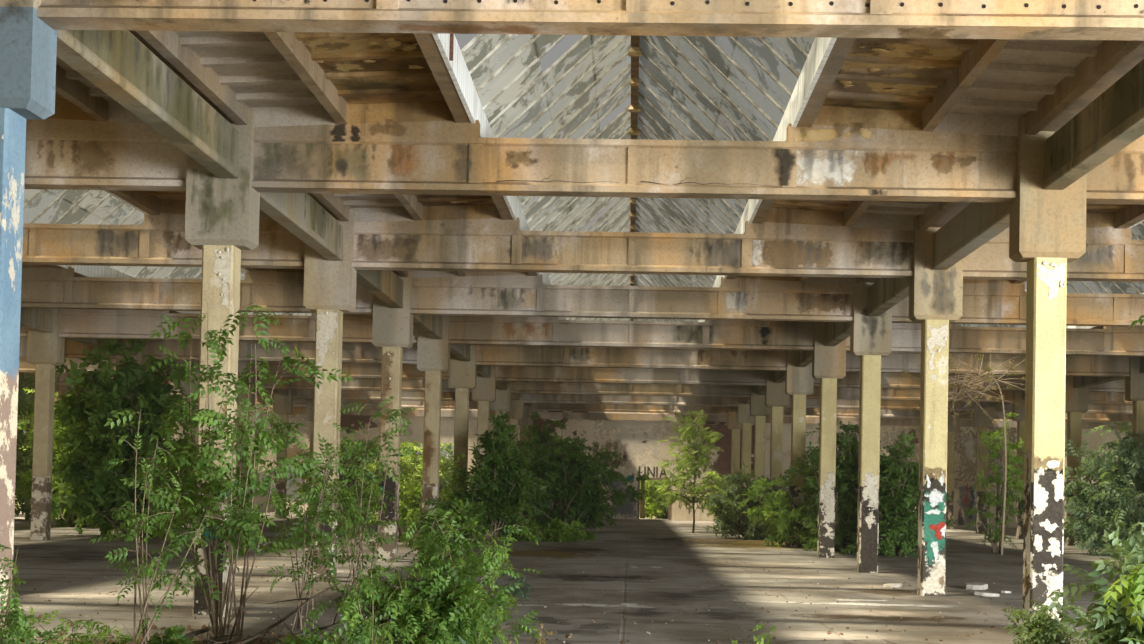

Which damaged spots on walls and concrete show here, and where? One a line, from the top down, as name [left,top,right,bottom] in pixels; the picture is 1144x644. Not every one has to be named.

water stain [330,124,360,142]
water stain [776,127,872,186]
peeling [821,472,835,524]
peeling [857,467,879,573]
peeling [883,419,1063,622]